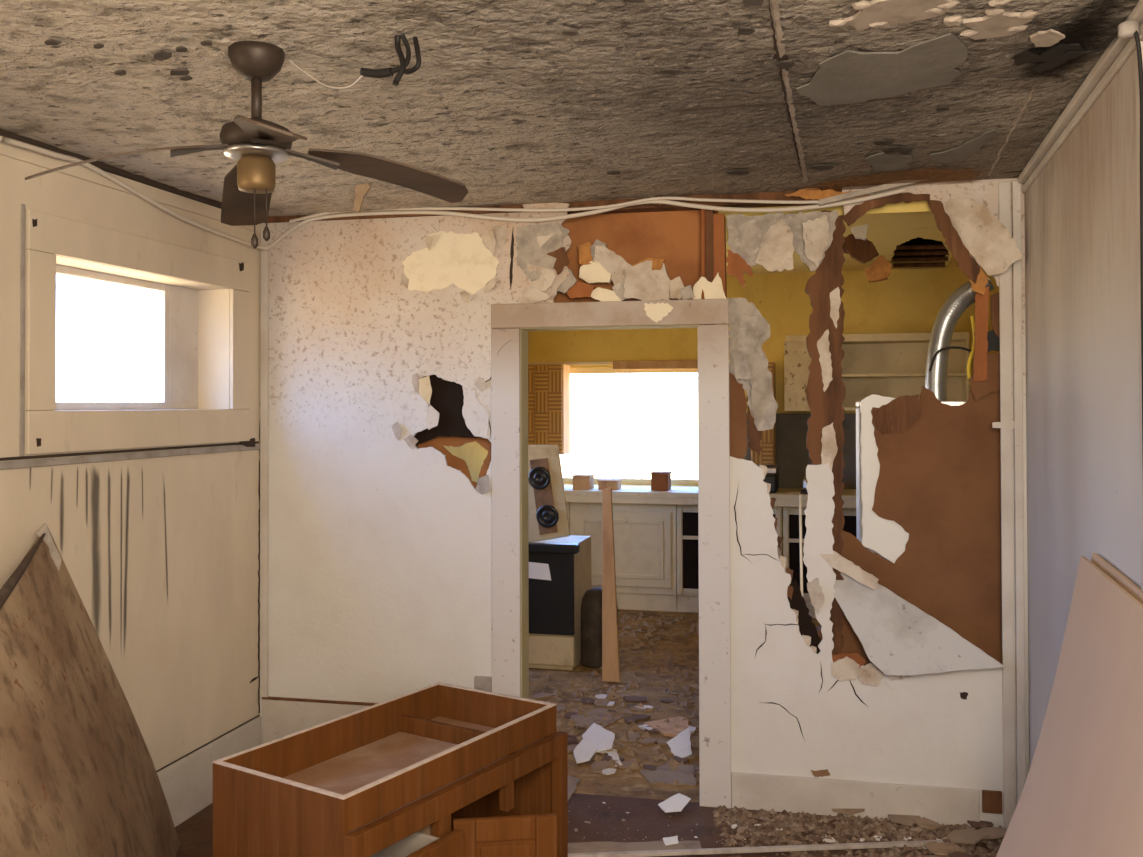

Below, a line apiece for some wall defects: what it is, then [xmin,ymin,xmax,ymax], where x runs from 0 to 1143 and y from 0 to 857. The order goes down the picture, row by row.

peeling [985,0,1040,32]
peeling [796,0,986,106]
peeling [401,222,570,304]
peeling [842,224,892,283]
flaking render [391,373,491,449]
water stain [51,479,63,548]
water stain [77,470,143,642]
crack [755,624,803,656]
crack [818,662,867,706]
peeling [831,652,913,686]
crack [759,702,806,742]